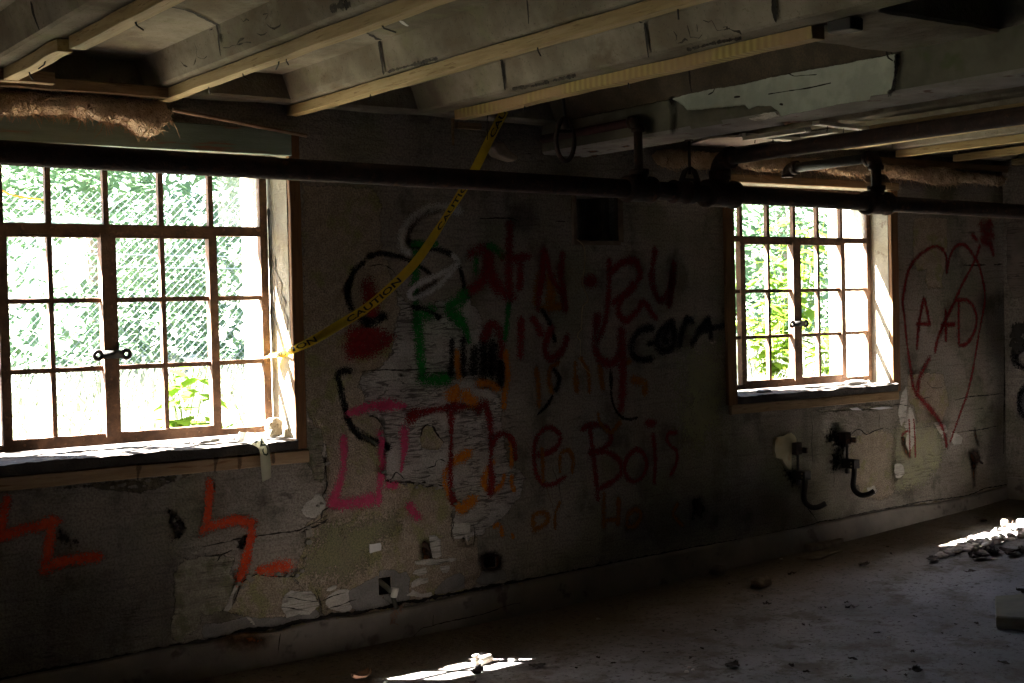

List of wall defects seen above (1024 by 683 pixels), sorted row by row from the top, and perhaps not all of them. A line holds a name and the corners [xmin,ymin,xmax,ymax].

peeling [673,51,895,121]
spalling [202,183,507,638]